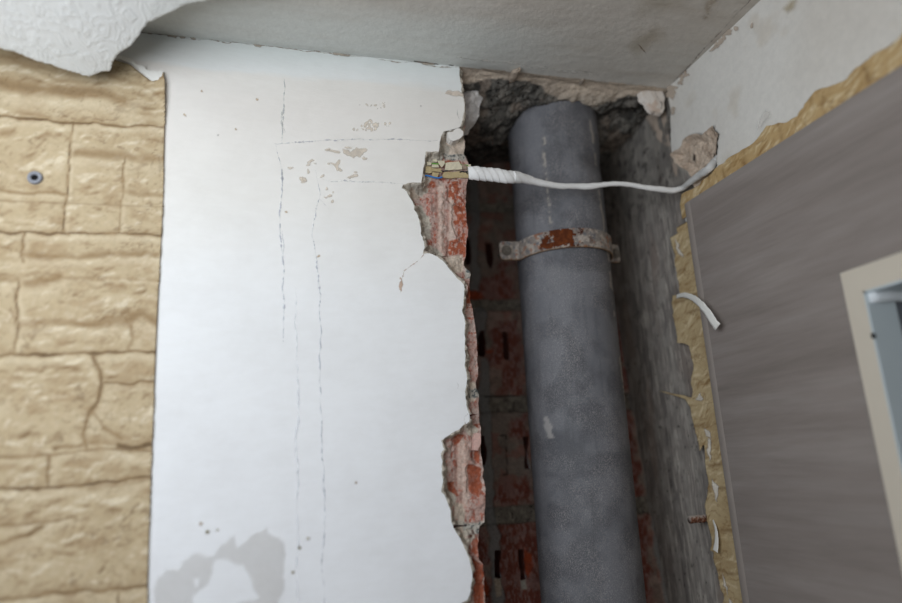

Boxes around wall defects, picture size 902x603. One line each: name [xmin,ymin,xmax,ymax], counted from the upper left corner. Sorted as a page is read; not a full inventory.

spalling [670,126,718,187]
corrosion [539,228,589,251]
spalling [402,67,487,603]